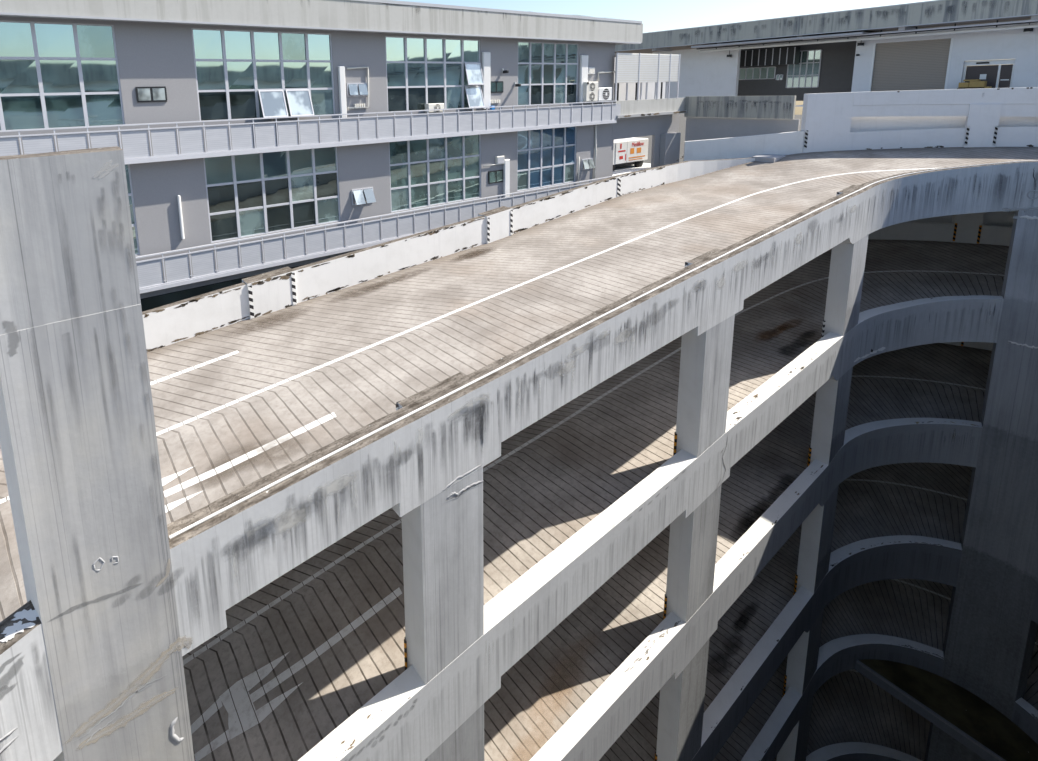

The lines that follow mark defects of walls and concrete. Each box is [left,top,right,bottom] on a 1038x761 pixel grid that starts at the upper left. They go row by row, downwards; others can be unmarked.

crack [69,638,192,749]